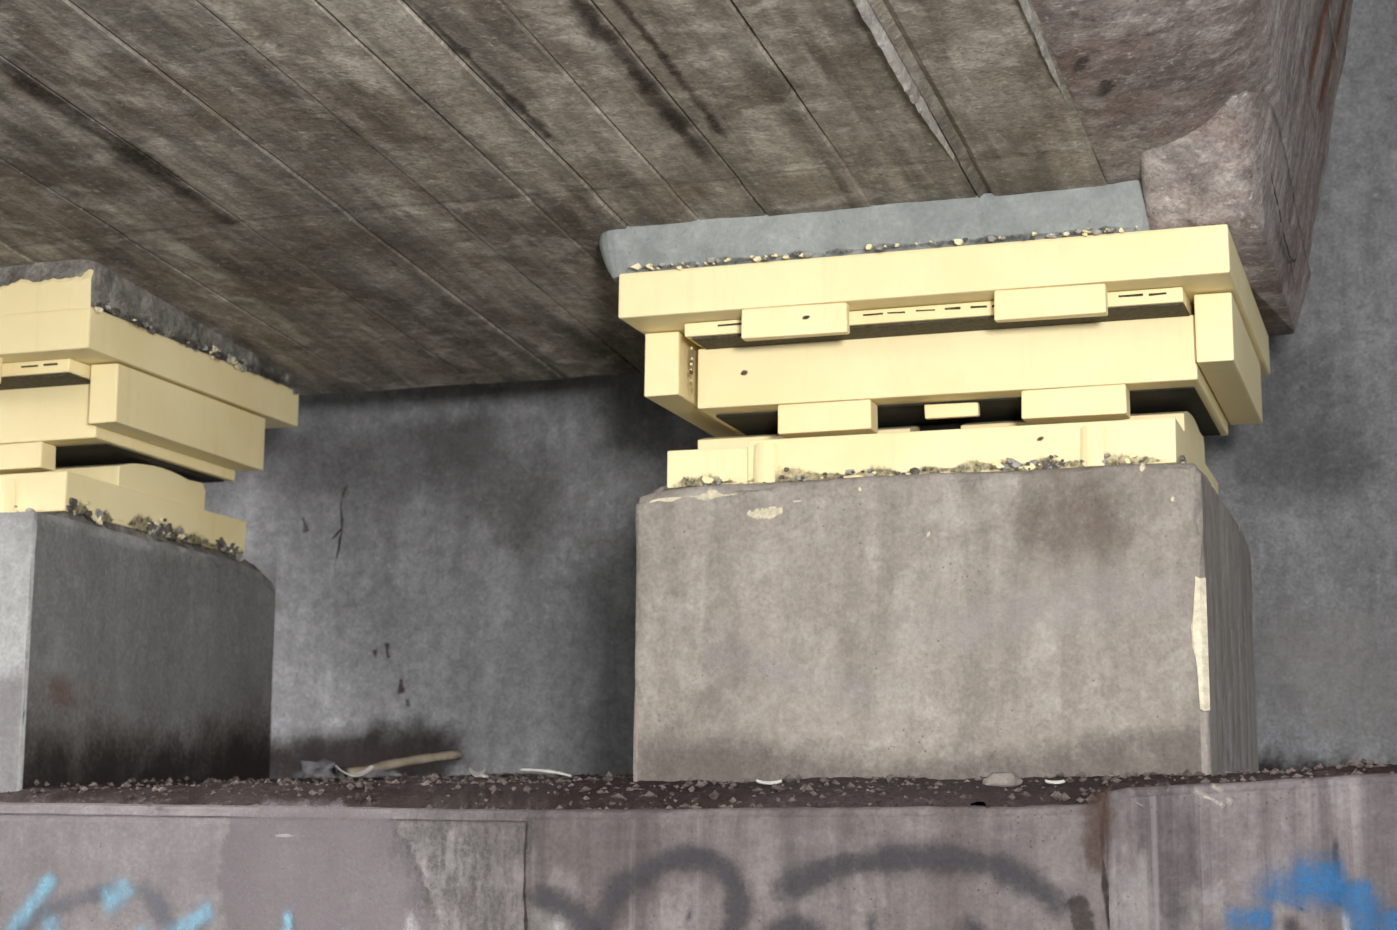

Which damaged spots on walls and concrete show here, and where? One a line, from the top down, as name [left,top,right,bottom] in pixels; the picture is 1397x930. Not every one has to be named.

crack [1271,176,1296,286]